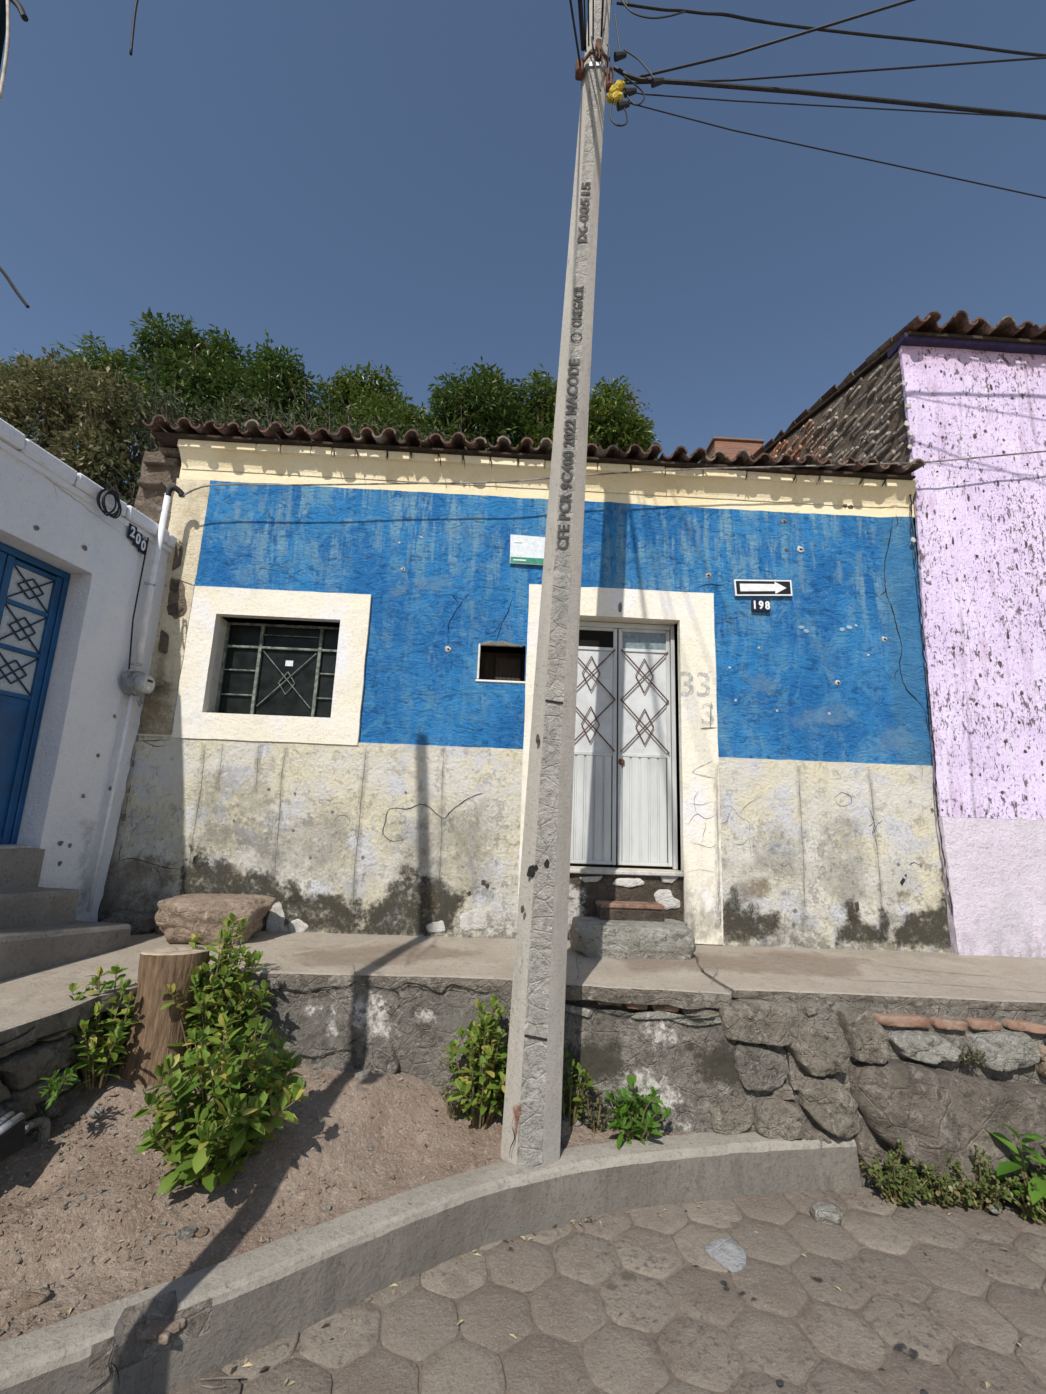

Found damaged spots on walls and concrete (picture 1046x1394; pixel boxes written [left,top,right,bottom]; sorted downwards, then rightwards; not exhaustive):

crack [836,494,953,916]
damp [180,846,467,936]
damp [720,886,780,941]
damp [835,868,951,949]
crack [565,952,671,1019]